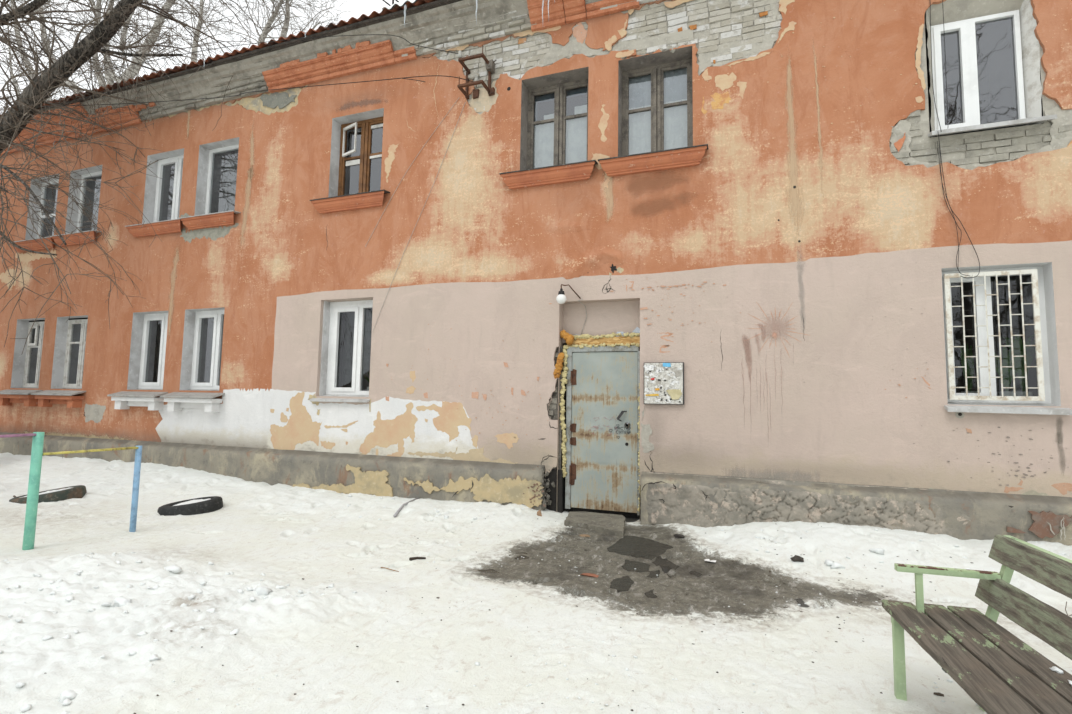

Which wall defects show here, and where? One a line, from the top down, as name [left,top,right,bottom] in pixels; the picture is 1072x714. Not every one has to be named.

flaking render [433,0,796,115]
flaking render [889,18,1072,170]
peeling [270,365,555,511]
peeling [953,427,1072,496]
peeling [1007,511,1072,539]